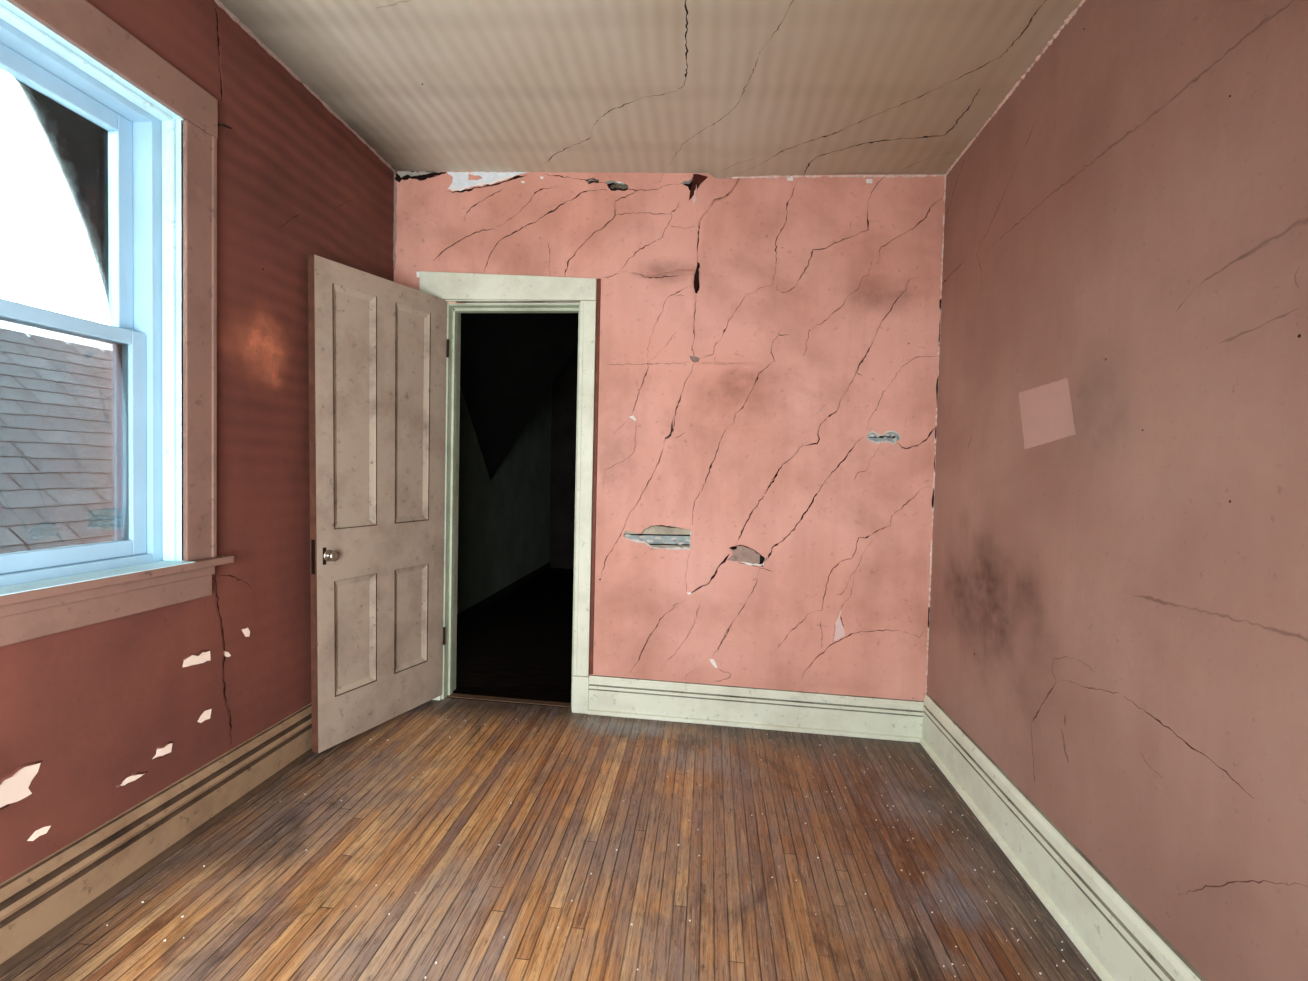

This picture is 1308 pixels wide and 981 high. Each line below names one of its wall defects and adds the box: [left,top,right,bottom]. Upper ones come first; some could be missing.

peeling [395,171,543,193]
crack [433,0,1051,682]
flaking render [866,430,900,444]
flaking render [623,525,692,550]
flaking render [727,545,770,571]
peeling [183,650,231,667]
crack [212,575,252,747]
peeling [197,709,212,723]
crack [1031,657,1252,797]
peeling [116,741,174,788]
peeling [0,760,43,810]
crack [1182,880,1307,895]